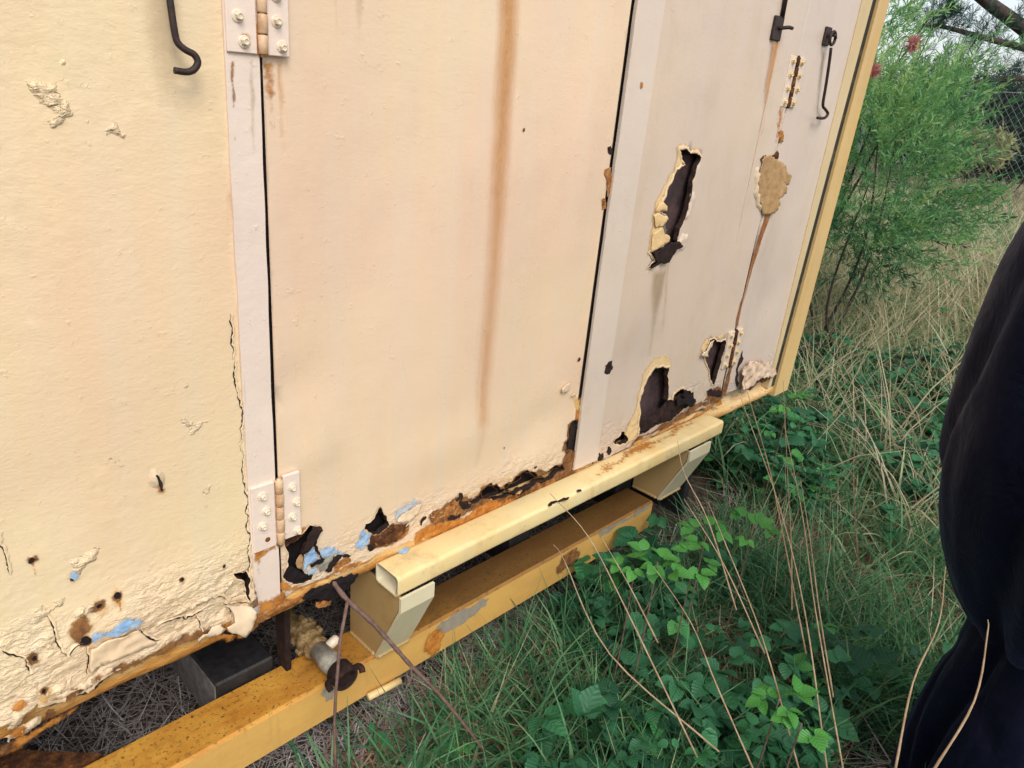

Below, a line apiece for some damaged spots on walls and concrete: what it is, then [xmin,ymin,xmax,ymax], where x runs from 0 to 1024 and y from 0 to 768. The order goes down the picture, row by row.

corrosion [498,0,513,174]
spalling [650,150,696,260]
corrosion [736,214,771,326]
spalling [639,367,684,424]
corrosion [597,366,733,475]
spalling [702,340,722,380]
peeling [89,618,157,673]
crack [141,313,254,641]
peeling [198,605,257,644]
corrosion [0,420,580,755]
spalling [286,526,313,572]
peeling [365,499,423,532]